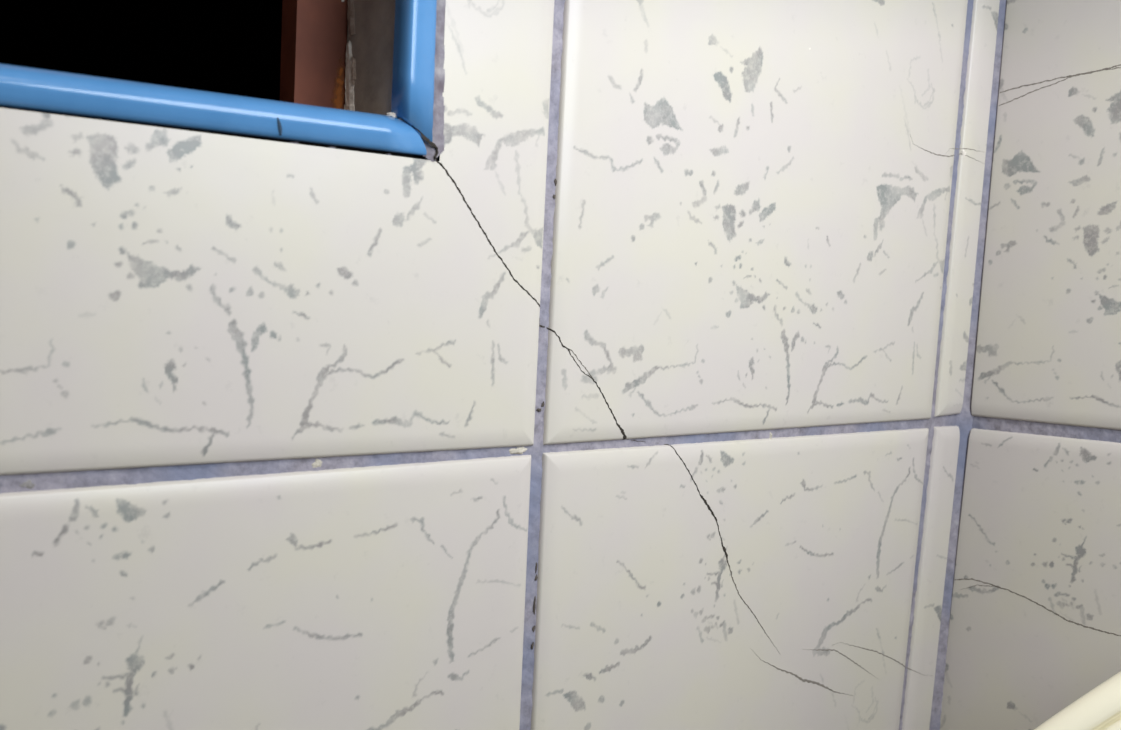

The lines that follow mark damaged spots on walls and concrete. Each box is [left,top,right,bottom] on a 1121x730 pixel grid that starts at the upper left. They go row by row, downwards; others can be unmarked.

crack [412,126,926,696]
crack [955,578,1121,636]